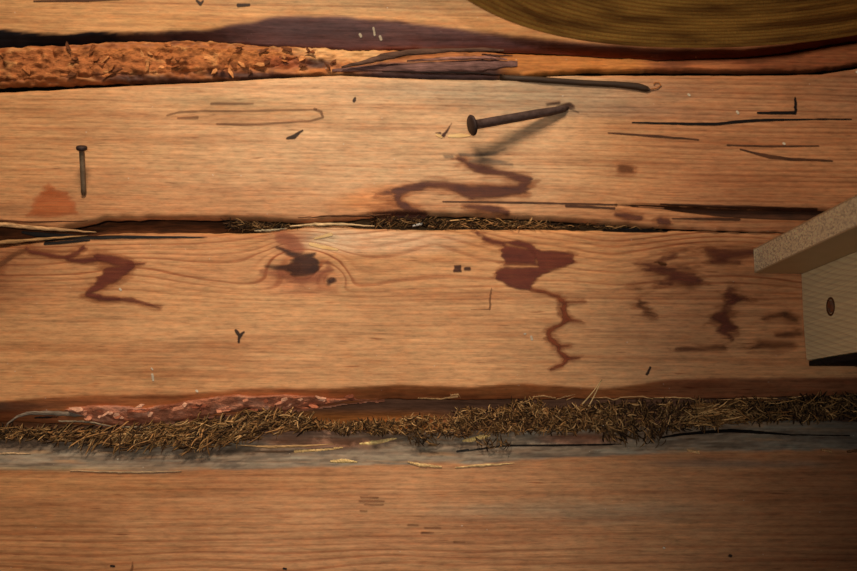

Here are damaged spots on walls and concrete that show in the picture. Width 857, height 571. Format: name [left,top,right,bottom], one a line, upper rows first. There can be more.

peeling [204,44,315,78]
damp [378,153,534,218]
crack [442,201,825,232]
crack [21,231,203,245]
damp [0,246,153,306]
damp [476,232,574,290]
damp [711,289,740,338]
peeling [69,407,124,420]
peeling [172,402,230,413]
peeling [243,396,330,410]
crack [456,444,619,452]
crack [662,429,850,438]